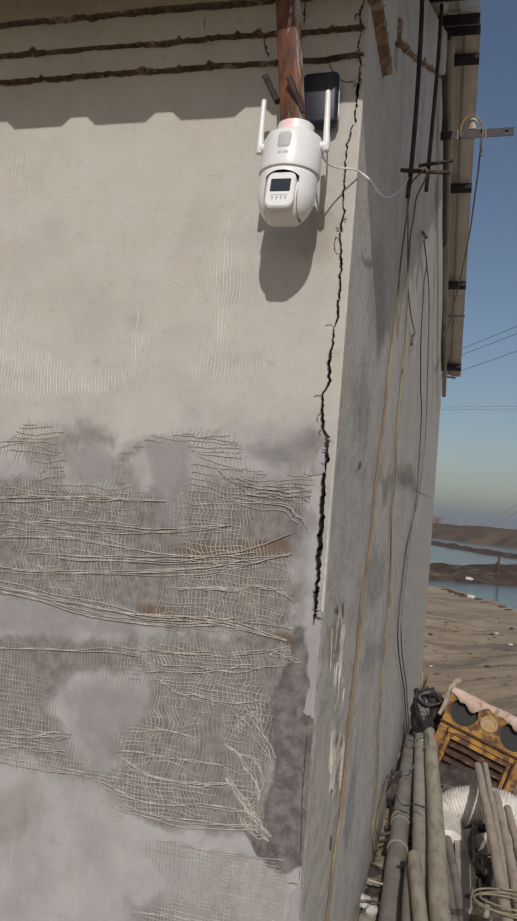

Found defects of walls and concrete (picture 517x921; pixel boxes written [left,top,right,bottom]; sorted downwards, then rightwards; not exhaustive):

crack [311,0,365,625]
peeling [314,447,325,475]
flaking render [244,623,321,873]